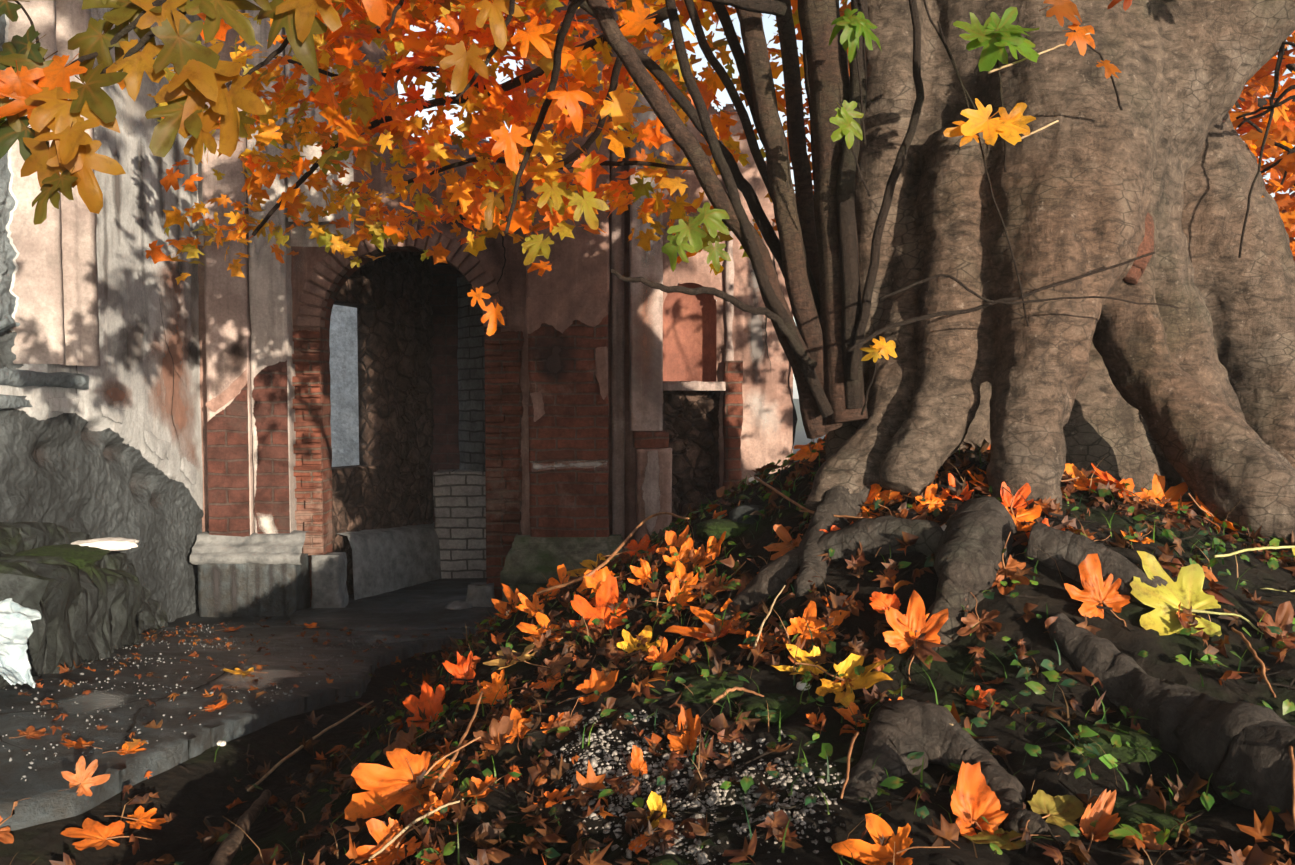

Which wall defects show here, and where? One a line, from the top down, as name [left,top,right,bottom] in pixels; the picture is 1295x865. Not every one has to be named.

damp [94,22,194,274]
flaking render [526,289,609,334]
flaking render [48,397,80,413]
flaking render [100,405,128,424]
damp [188,340,198,365]
flaking render [206,369,247,412]
flaking render [530,391,545,422]
flaking render [595,346,608,400]